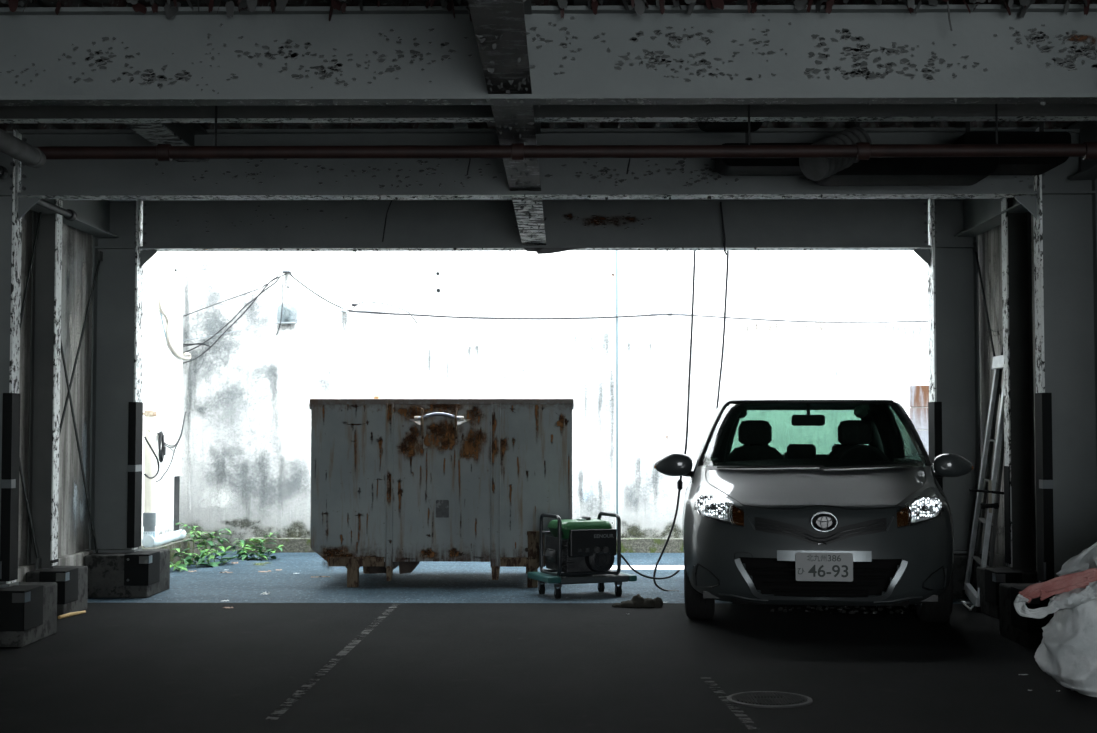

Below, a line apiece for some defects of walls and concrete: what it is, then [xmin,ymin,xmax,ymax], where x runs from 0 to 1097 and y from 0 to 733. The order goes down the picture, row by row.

peeling [58,0,582,94]
peeling [593,0,787,82]
peeling [804,28,988,82]
peeling [963,0,1097,72]
leakage [184,286,204,413]
leakage [268,338,311,485]